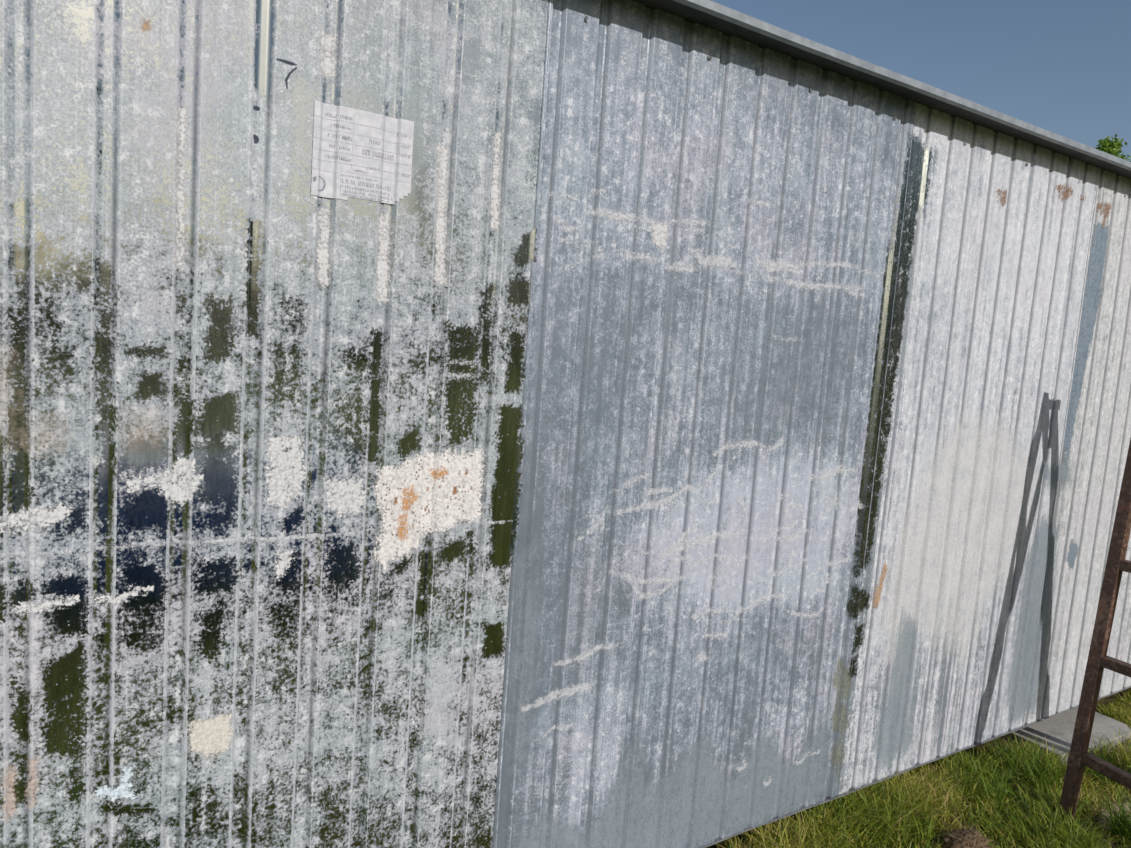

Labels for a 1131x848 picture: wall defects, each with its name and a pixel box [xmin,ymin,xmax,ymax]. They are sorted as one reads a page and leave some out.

damp [433,142,449,285]
corrosion [1056,183,1111,228]
damp [123,453,204,508]
damp [264,433,309,511]
damp [0,499,72,534]
damp [322,448,488,573]
corrosion [391,466,472,541]
damp [274,548,295,578]
damp [15,594,80,618]
damp [94,585,154,610]
damp [187,714,234,758]
damp [93,766,137,802]